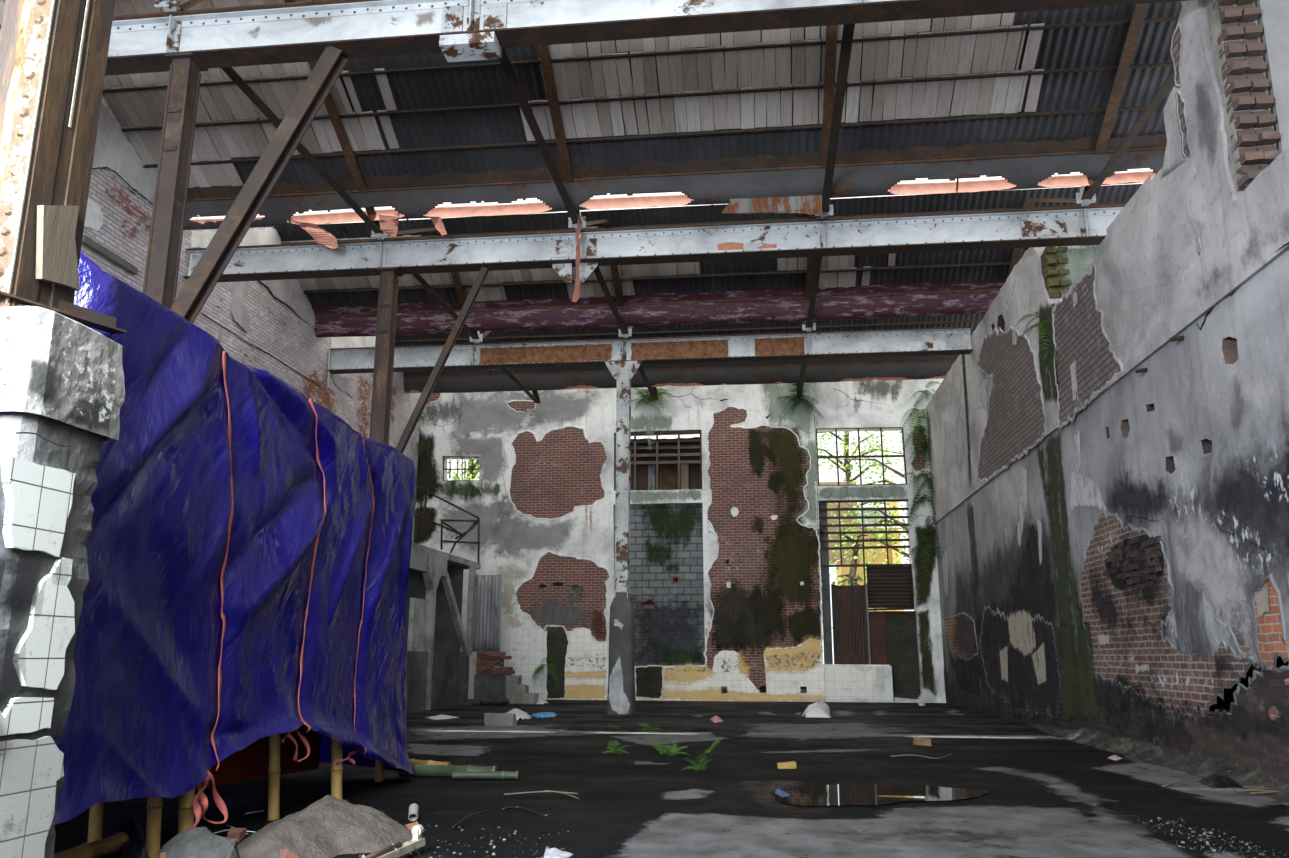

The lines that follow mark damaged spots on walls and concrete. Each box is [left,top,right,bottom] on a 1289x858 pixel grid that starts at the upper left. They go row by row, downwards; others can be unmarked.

spalling [505,400,536,414]
spalling [508,426,609,520]
spalling [515,550,673,714]
damp [752,517,762,534]
spalling [698,406,823,693]
damp [764,446,781,494]
damp [786,604,823,645]
spalling [977,247,1124,485]
damp [1004,429,1232,721]
spalling [1079,511,1289,830]
damp [1169,469,1271,635]
damp [1247,444,1289,502]